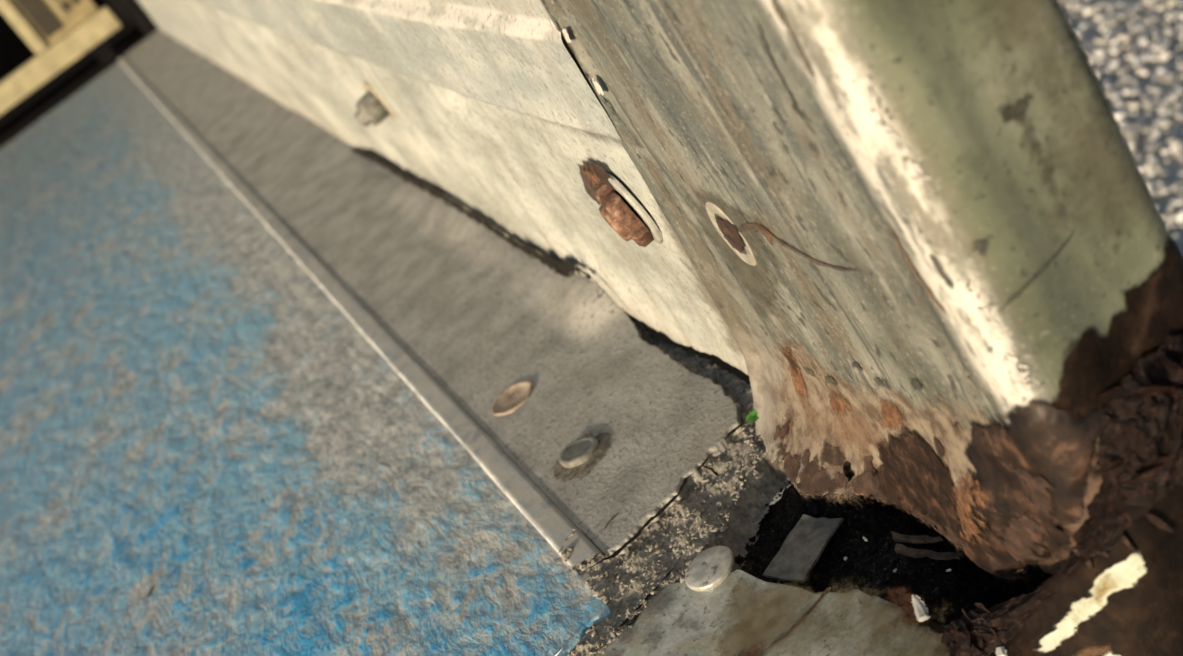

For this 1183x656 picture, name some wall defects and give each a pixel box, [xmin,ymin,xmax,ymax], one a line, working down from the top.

rust [577,160,623,205]
peeling [1001,354,1032,388]
rust [771,341,990,551]
peeling [1144,512,1174,533]
peeling [1038,535,1146,652]